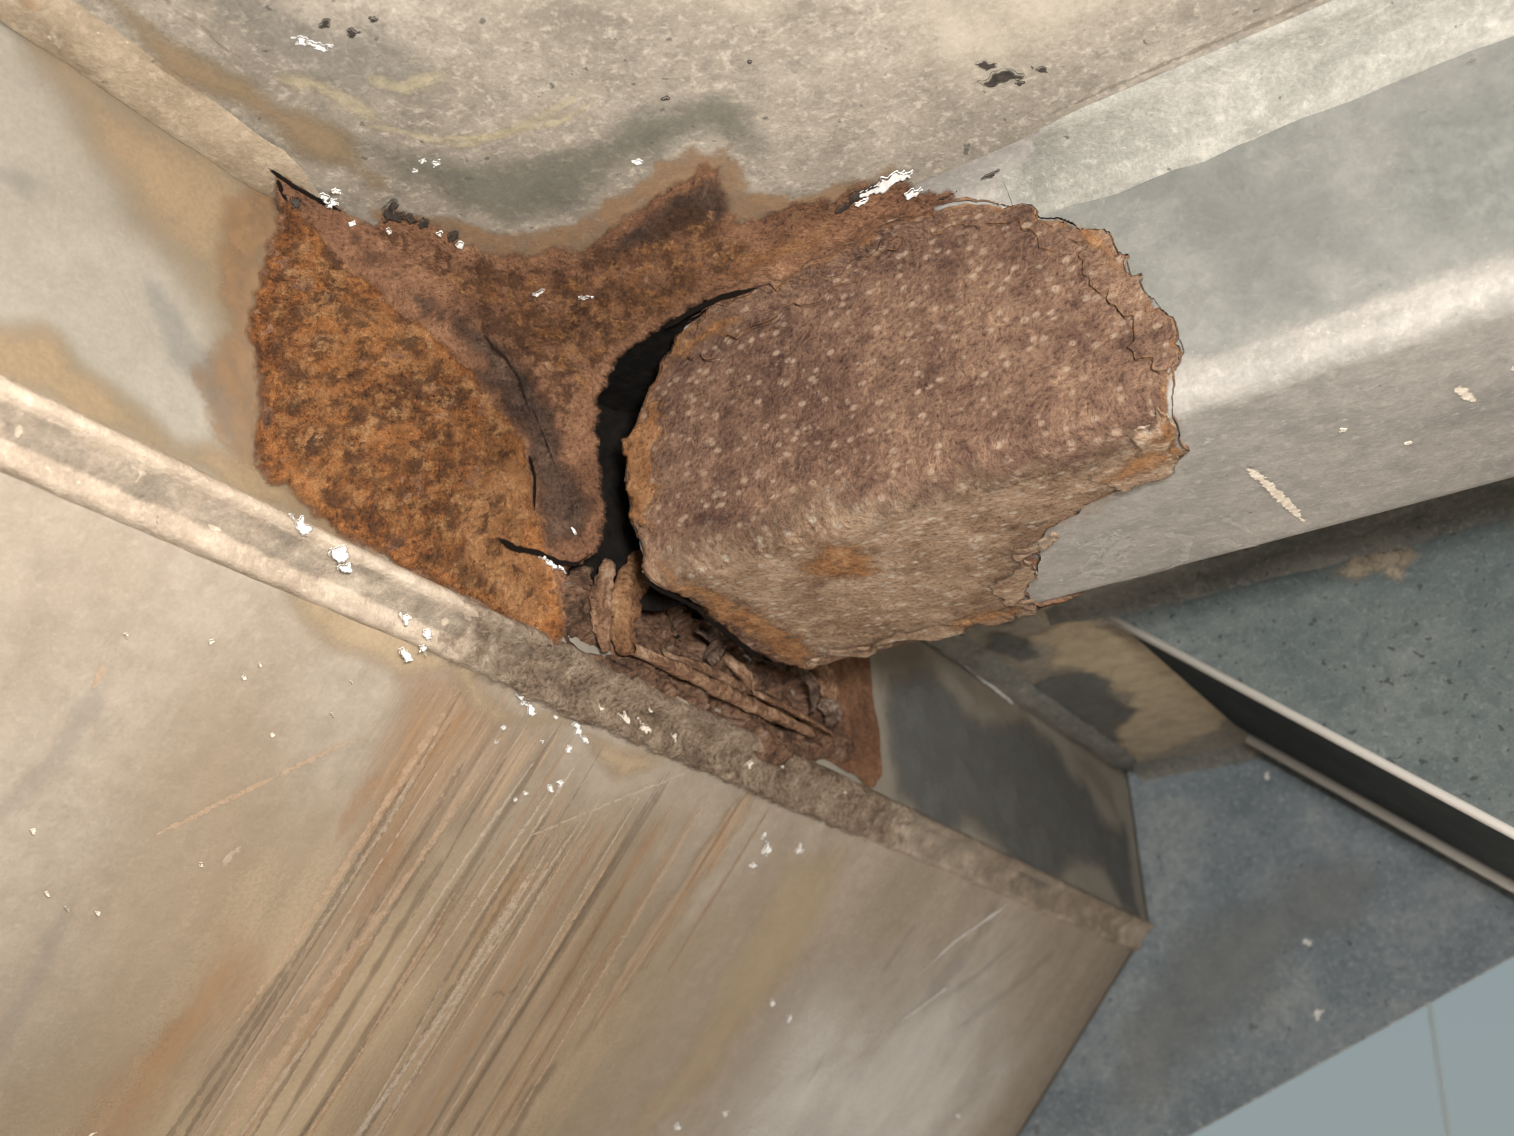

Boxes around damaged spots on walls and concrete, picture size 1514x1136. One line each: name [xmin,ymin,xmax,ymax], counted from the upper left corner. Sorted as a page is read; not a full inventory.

corrosion [0,150,955,1136]
crack [485,335,556,509]
peeling [515,694,653,754]
crack [500,286,777,668]